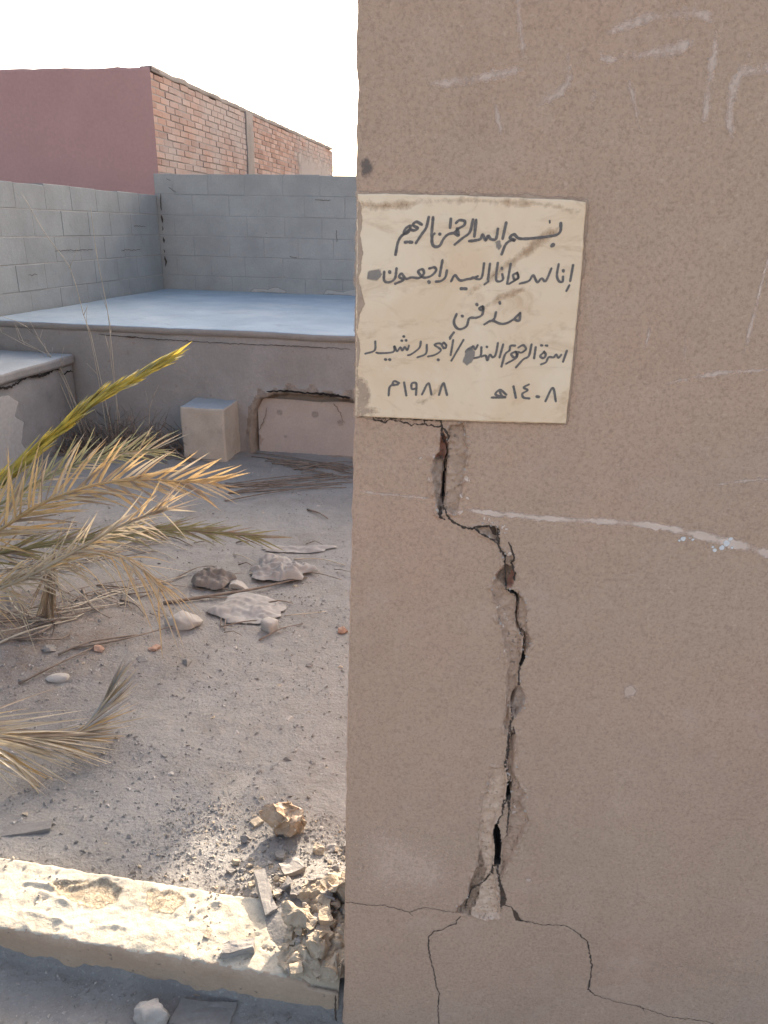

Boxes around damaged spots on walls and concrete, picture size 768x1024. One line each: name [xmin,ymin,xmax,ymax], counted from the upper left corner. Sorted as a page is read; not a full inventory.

crack [0,369,72,390]
crack [258,390,713,1024]
flaking render [419,422,768,921]